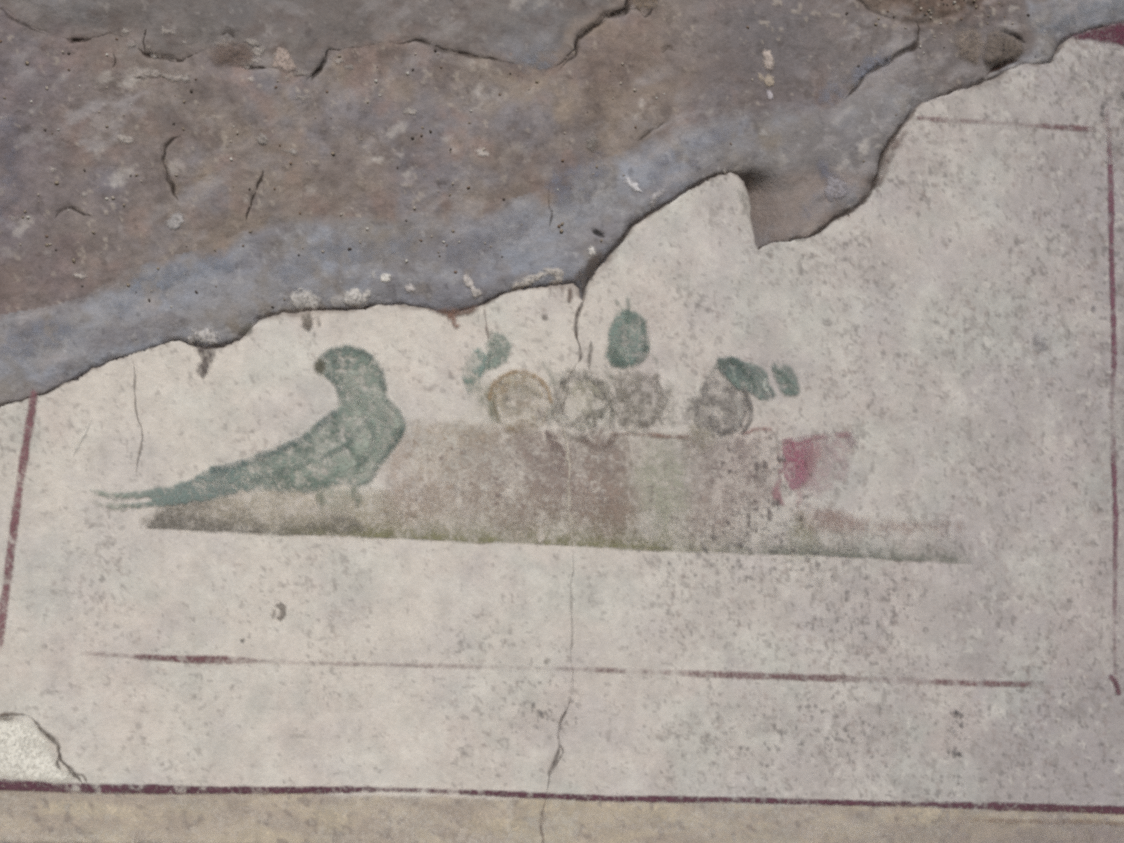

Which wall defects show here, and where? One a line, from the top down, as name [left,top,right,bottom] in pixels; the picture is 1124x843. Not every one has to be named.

crack [563,0,653,65]
spalling [0,0,1124,407]
crack [575,300,591,362]
crack [0,713,85,784]